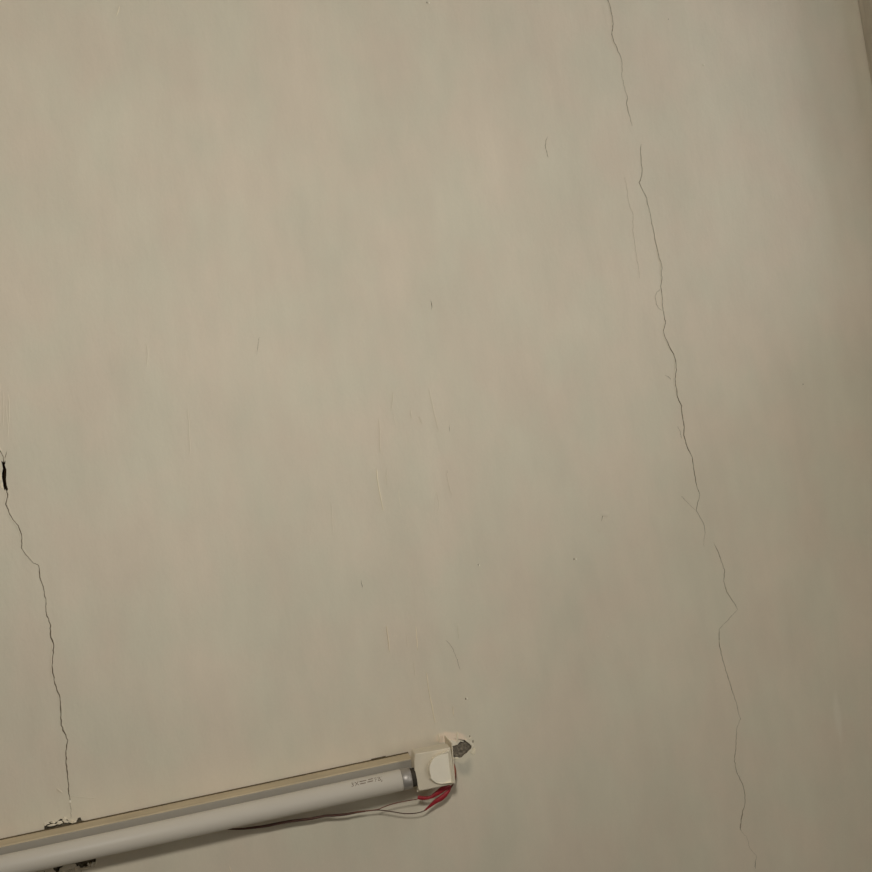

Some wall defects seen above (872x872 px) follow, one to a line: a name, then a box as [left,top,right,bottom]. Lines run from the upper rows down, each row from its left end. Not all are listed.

crack [608,1,622,60]
crack [0,388,94,807]
spalling [426,729,476,760]
crack [625,147,757,866]